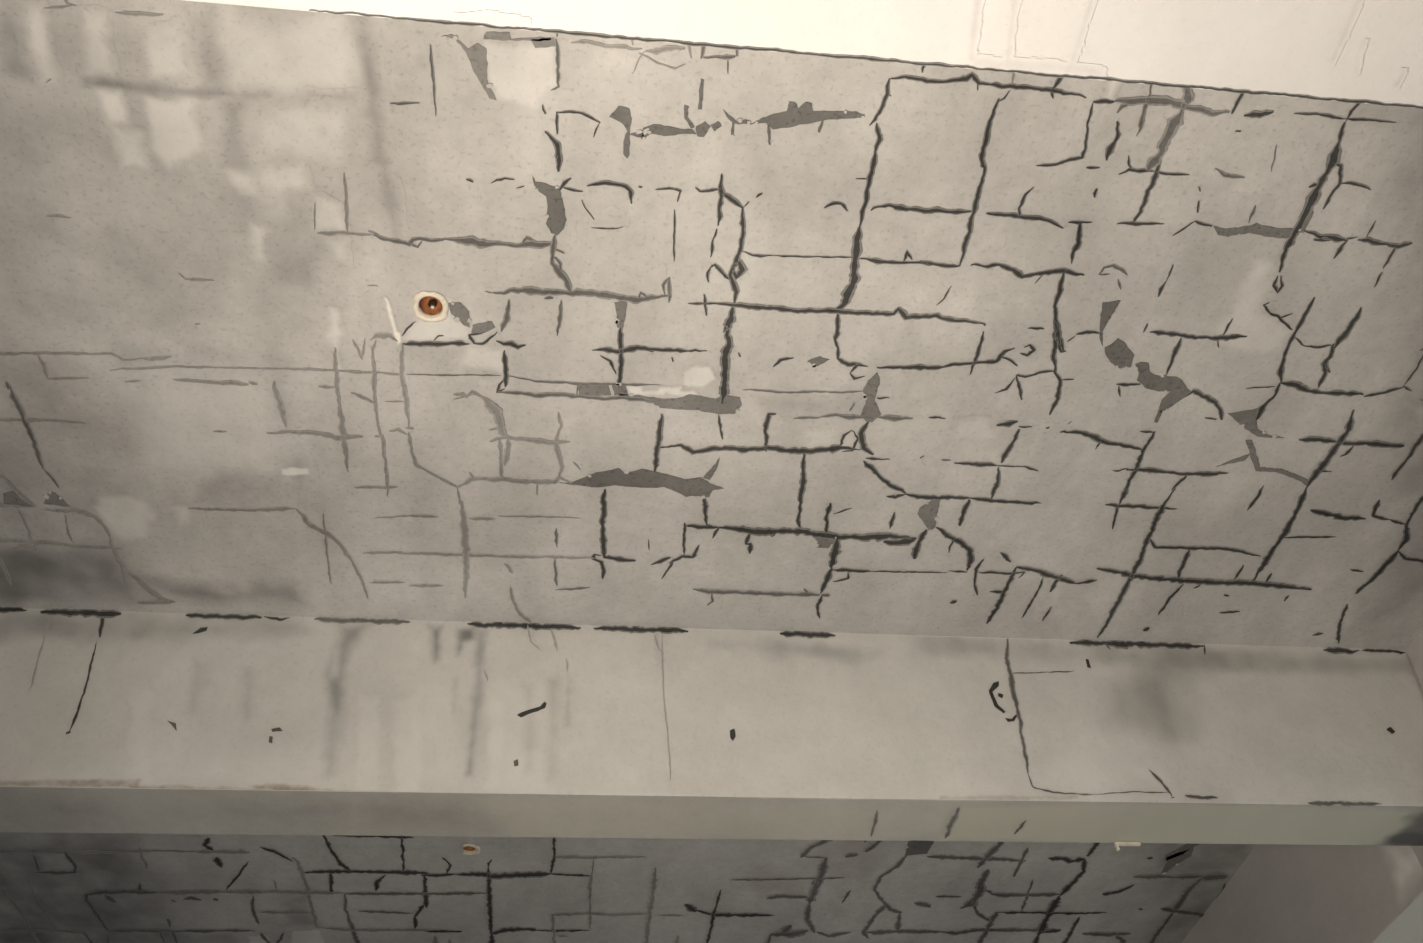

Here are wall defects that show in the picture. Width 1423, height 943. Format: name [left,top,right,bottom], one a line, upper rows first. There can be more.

spalling [609,79,865,159]
spalling [533,178,567,235]
crack [0,33,1423,671]
spalling [1099,300,1190,423]
spalling [560,457,724,499]
crack [28,615,51,692]
crack [66,618,105,734]
crack [654,635,671,776]
crack [1004,639,1218,800]
crack [0,807,1228,943]
spalling [905,841,934,856]
crack [1308,800,1382,808]